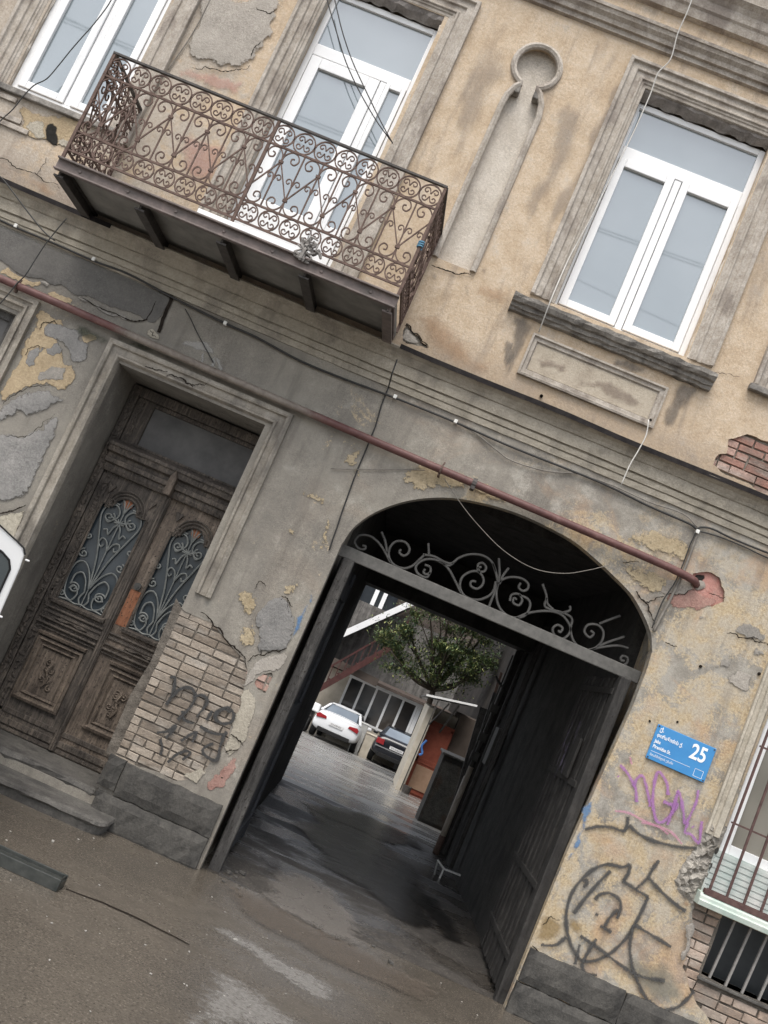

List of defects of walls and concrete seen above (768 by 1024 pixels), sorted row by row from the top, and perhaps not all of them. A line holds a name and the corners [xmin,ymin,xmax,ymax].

peeling [188,0,283,72]
peeling [0,310,97,400]
flaking render [713,435,768,494]
flaking render [660,572,725,619]
flaking render [105,591,287,790]